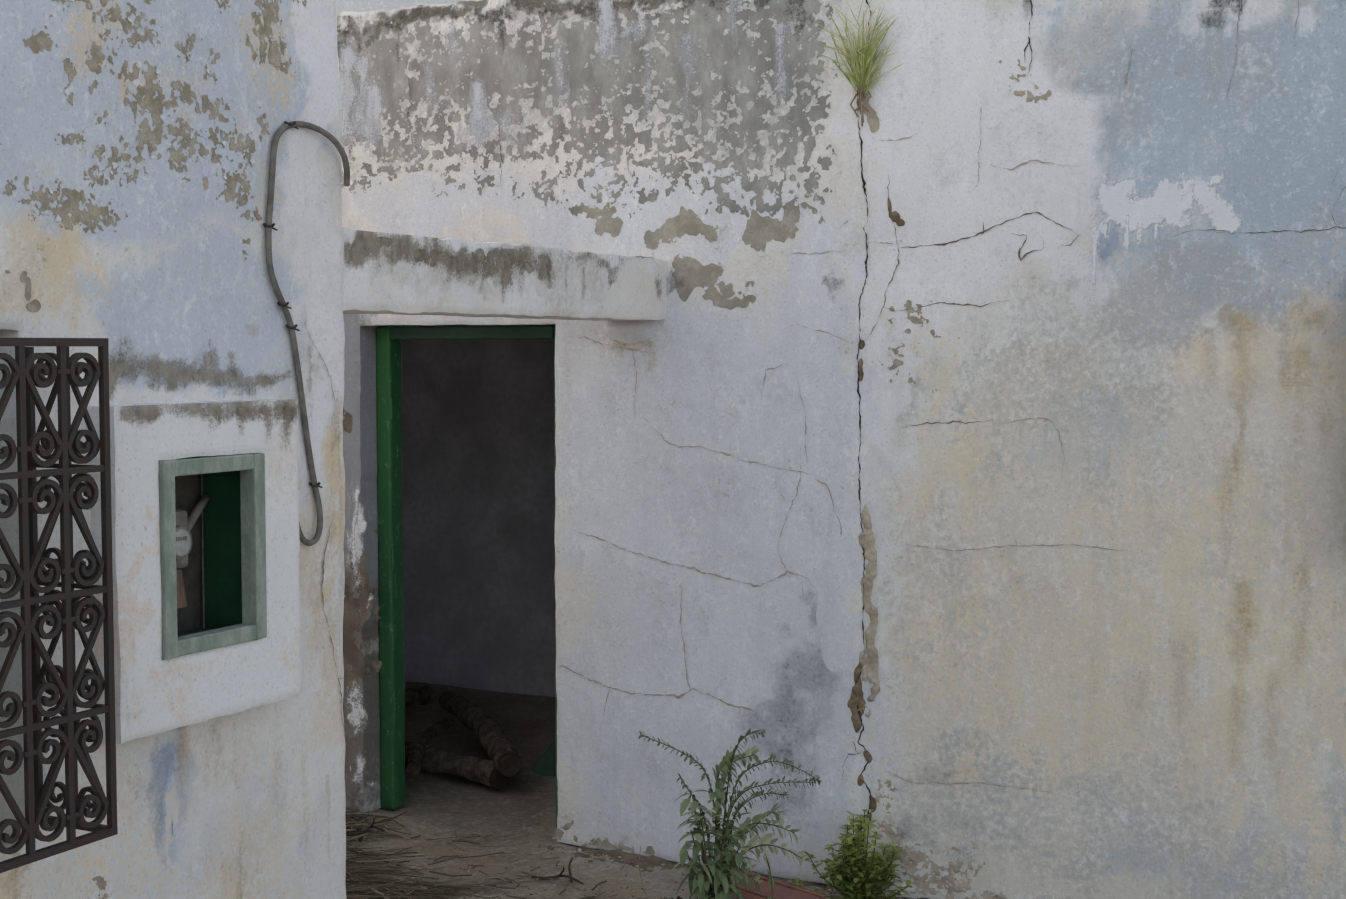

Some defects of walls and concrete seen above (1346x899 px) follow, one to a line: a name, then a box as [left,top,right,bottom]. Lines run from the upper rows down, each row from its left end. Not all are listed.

peeling [245,0,307,74]
peeling [3,0,272,234]
peeling [337,0,841,310]
peeling [342,409,352,433]
crack [559,84,1079,814]
crack [899,543,1124,551]
peeling [343,549,384,686]
peeling [93,876,108,899]